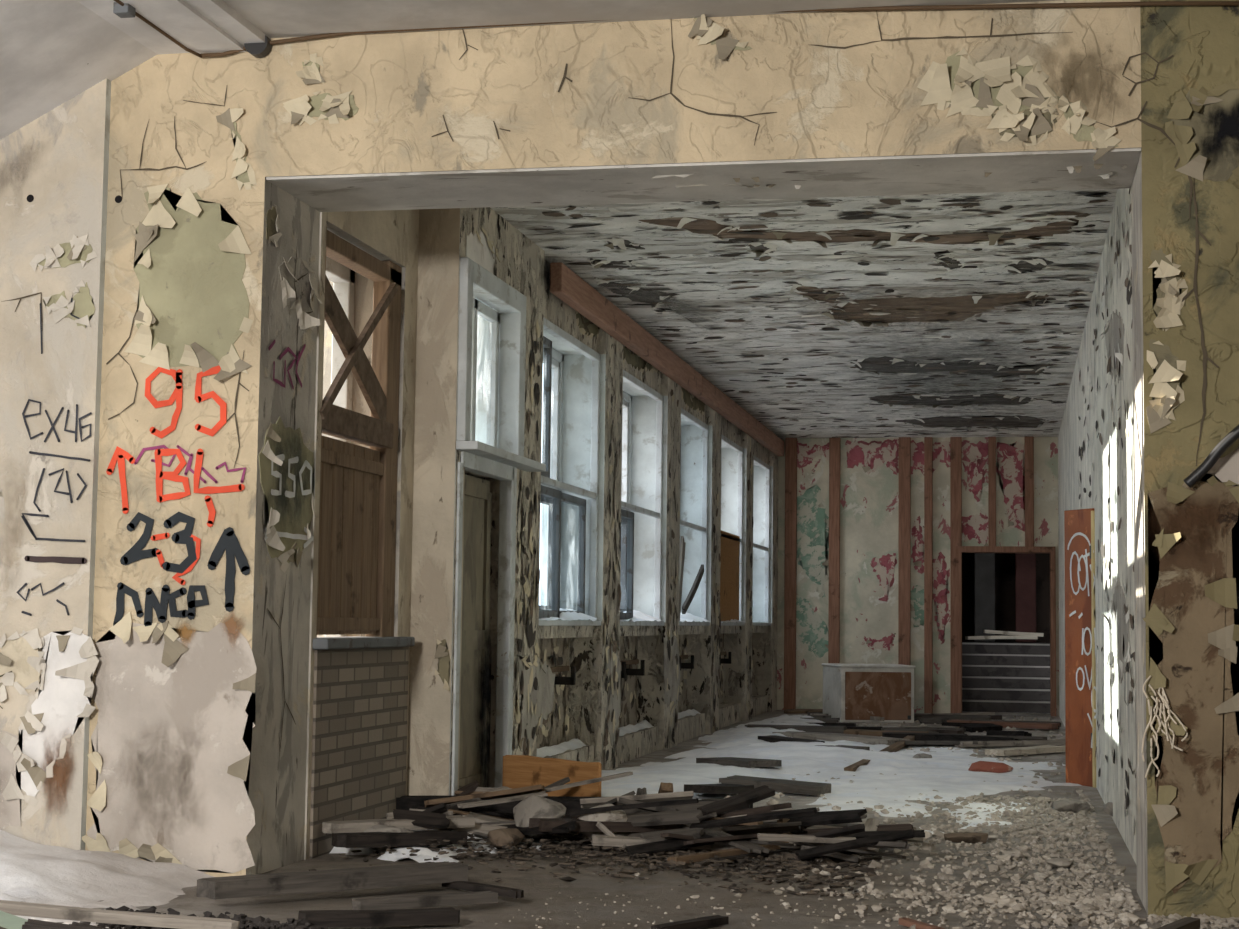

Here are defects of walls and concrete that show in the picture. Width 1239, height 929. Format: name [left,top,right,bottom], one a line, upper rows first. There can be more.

crack [120,87,227,194]
crack [432,115,454,142]
crack [459,29,478,60]
crack [558,63,572,92]
crack [628,23,777,146]
crack [814,11,1070,49]
peeling [917,48,1127,179]
flaking render [1165,79,1239,182]
peeling [124,184,253,381]
peeling [266,204,323,332]
flaking render [513,174,1239,894]
peeling [0,612,257,873]